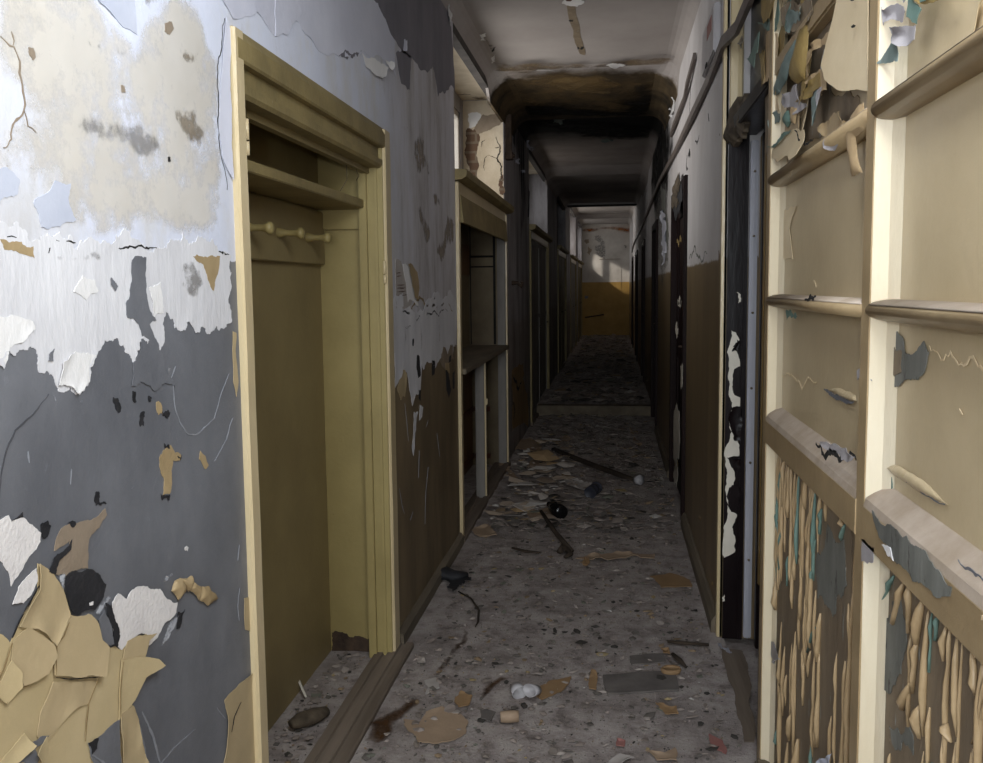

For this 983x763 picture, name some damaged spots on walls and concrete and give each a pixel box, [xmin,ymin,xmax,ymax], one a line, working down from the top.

crack [0,31,37,148]
leakage [84,123,157,153]
leakage [176,114,203,140]
flaking render [0,0,455,427]
leakage [498,58,667,116]
peeling [737,0,938,177]
peeling [393,263,457,456]
peeling [722,331,743,558]
crack [929,345,983,372]
peeling [0,491,219,763]
peeling [770,456,983,763]
peeling [224,673,255,763]